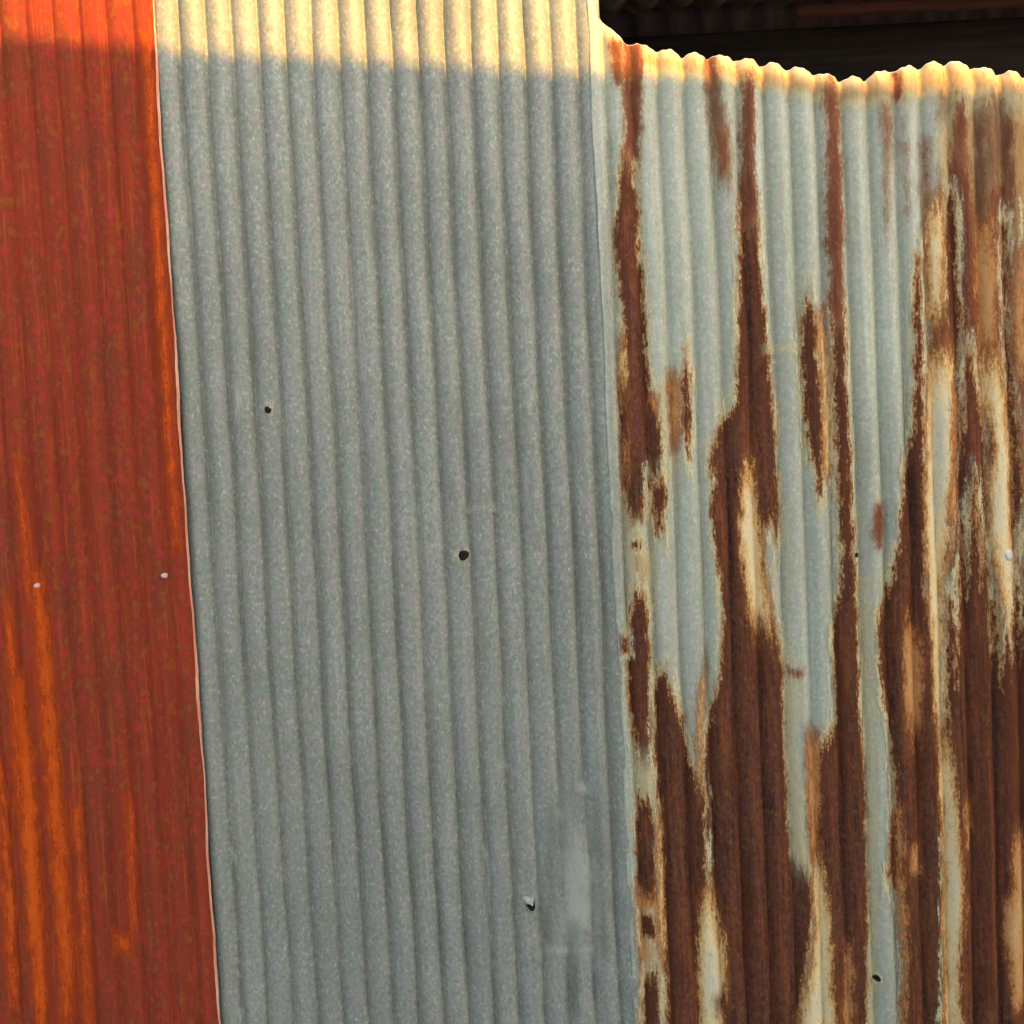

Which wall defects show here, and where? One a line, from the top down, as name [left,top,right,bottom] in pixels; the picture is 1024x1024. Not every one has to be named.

corrosion [0,471,93,1024]
corrosion [113,807,137,953]
corrosion [142,34,180,549]
corrosion [606,30,1024,1024]